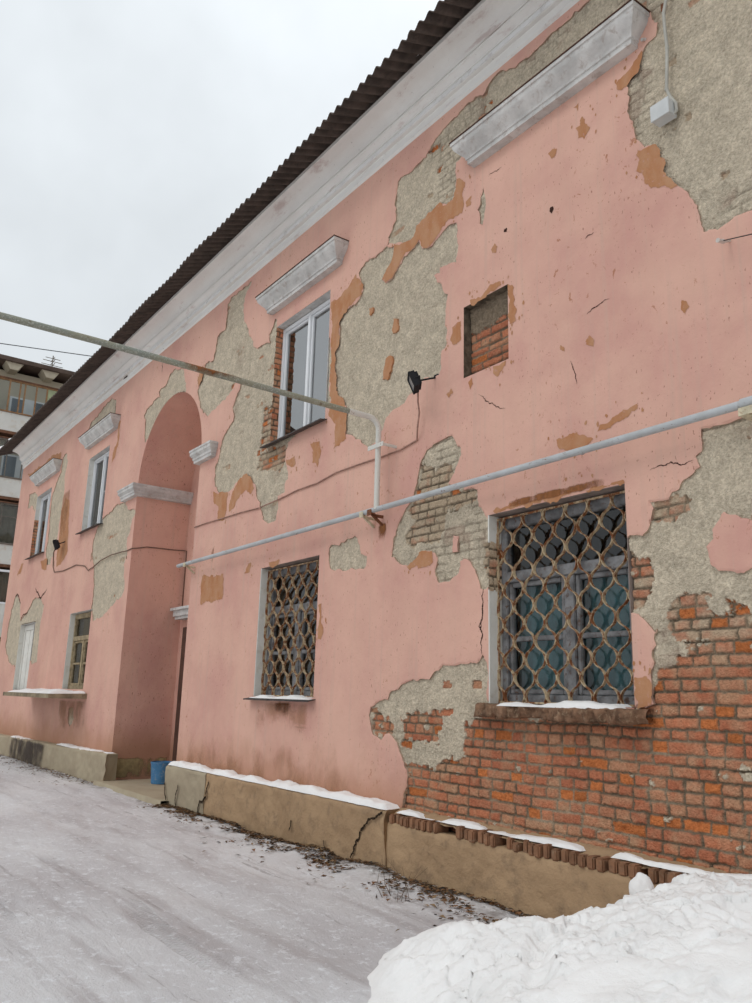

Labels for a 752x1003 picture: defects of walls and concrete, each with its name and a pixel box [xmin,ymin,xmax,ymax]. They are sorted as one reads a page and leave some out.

flaking render [144,0,752,529]
flaking render [91,503,136,621]
flaking render [328,536,367,571]
flaking render [5,594,44,667]
flaking render [369,418,752,874]
crack [164,782,209,813]
crack [350,812,382,858]